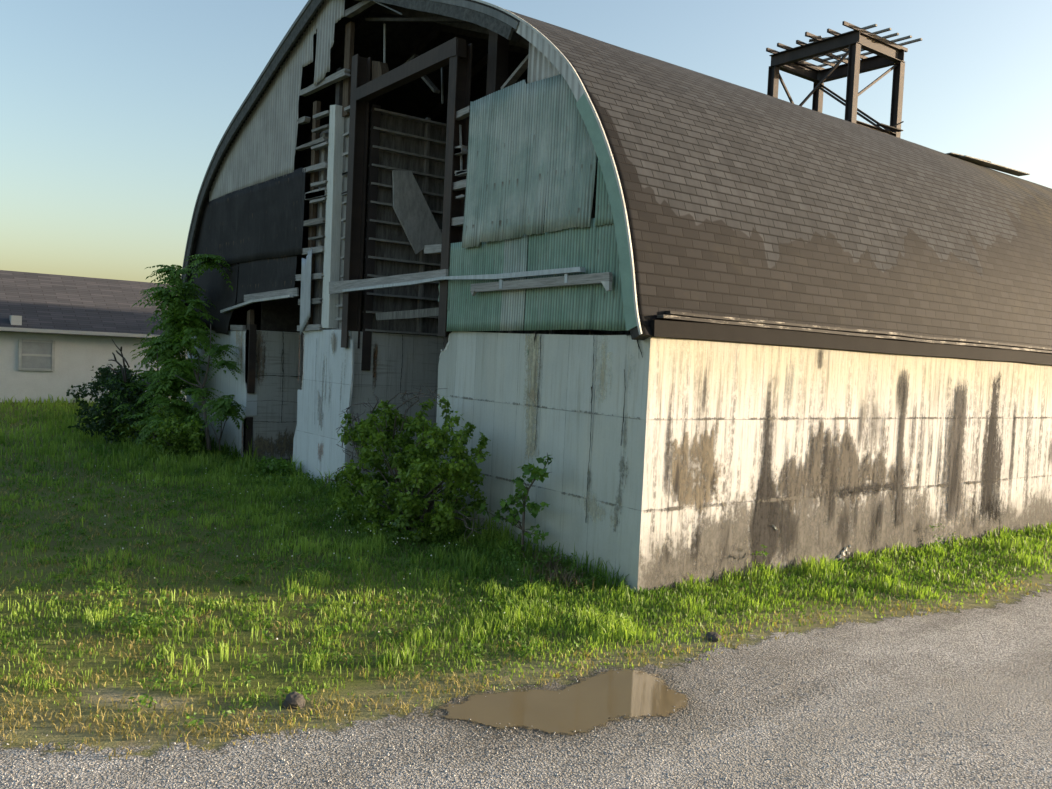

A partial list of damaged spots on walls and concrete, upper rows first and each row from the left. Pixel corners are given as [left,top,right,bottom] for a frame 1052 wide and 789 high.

leakage [639,368,1052,591]